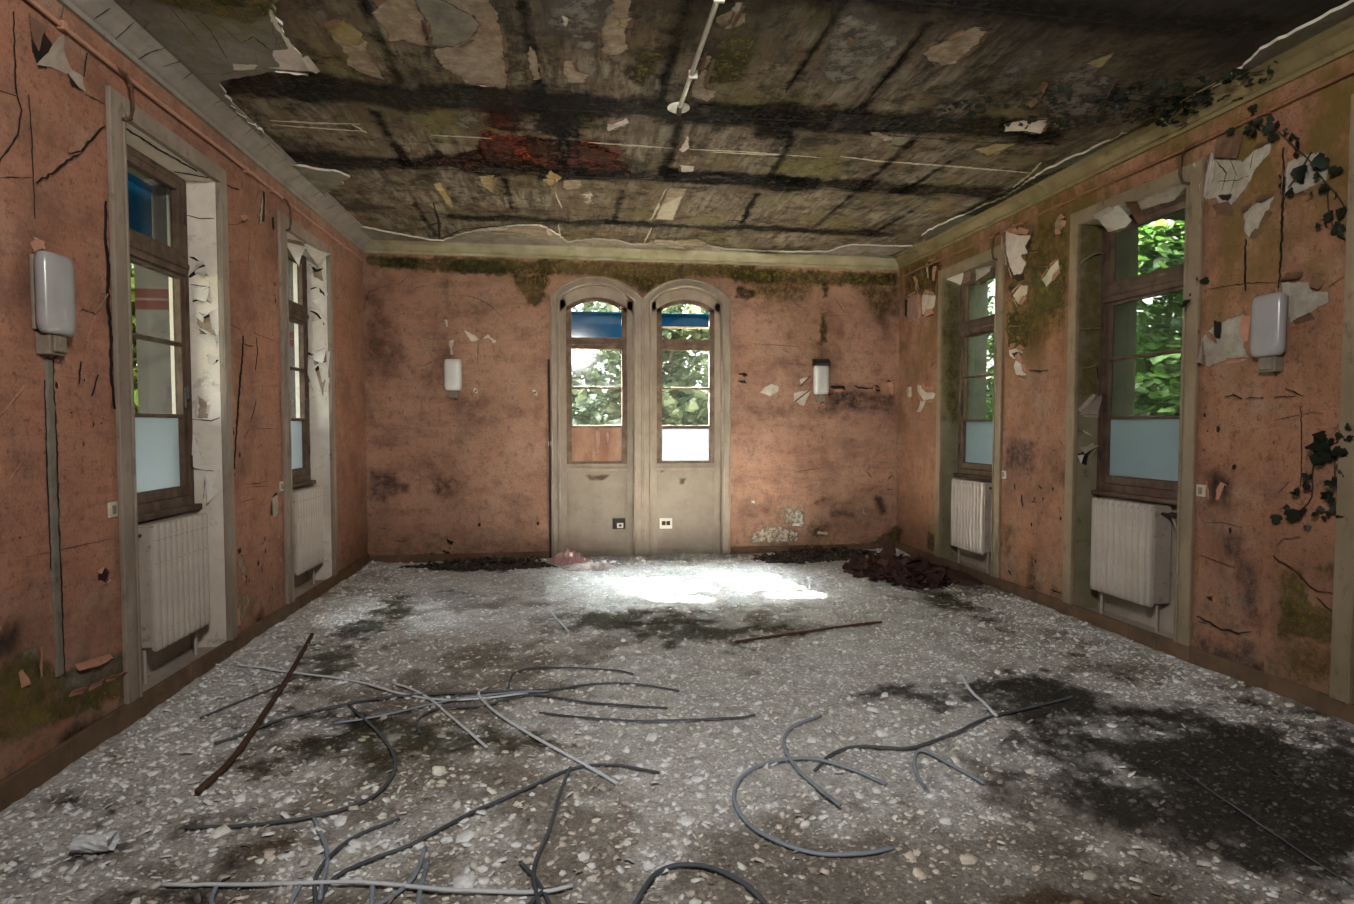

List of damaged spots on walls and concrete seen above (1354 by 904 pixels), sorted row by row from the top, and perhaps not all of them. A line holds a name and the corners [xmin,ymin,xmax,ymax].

crack [785,0,846,93]
peeling [1211,0,1354,90]
crack [0,0,665,504]
peeling [114,0,1143,257]
water stain [366,250,958,418]
water stain [223,0,1272,237]
crack [727,183,984,226]
crack [854,383,882,391]
peeling [905,224,1060,326]
water stain [1006,221,1102,395]
peeling [1093,130,1329,239]
mould [0,626,124,739]